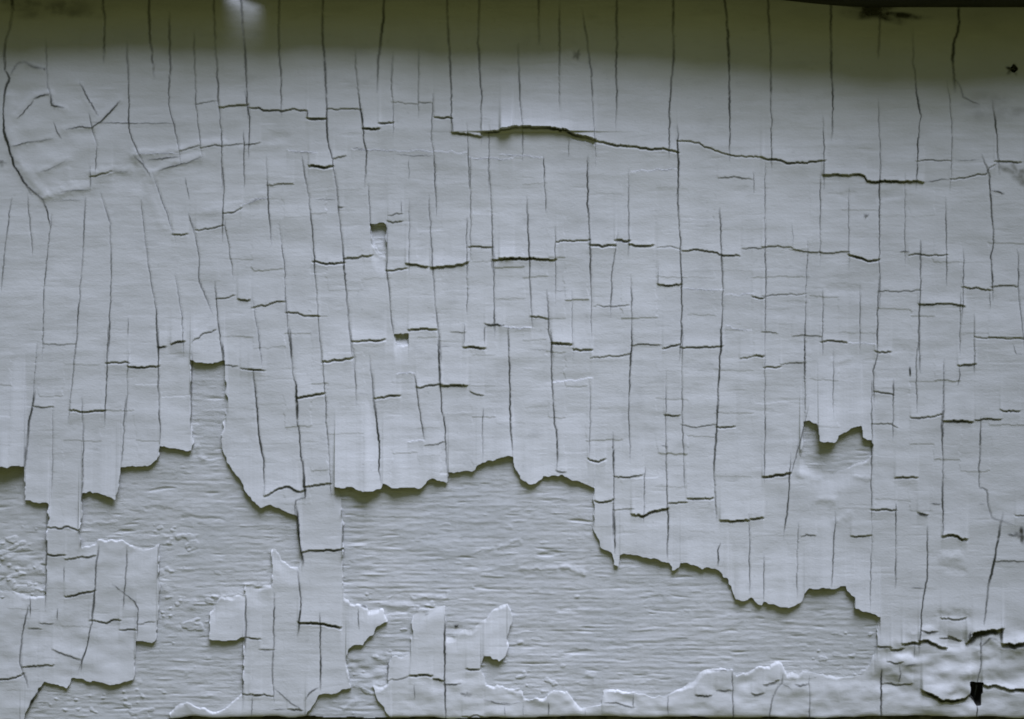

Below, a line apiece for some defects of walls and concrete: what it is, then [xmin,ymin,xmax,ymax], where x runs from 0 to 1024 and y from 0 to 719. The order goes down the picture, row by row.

crack [3,63,334,230]
peeling [0,411,50,598]
peeling [20,308,302,719]
crack [90,246,319,412]
crack [256,380,343,560]
crack [367,319,483,471]
crack [393,221,565,278]
peeling [306,406,881,718]
crack [586,90,767,478]
peeling [799,361,873,474]
crack [767,61,1022,471]
crack [871,457,1024,713]